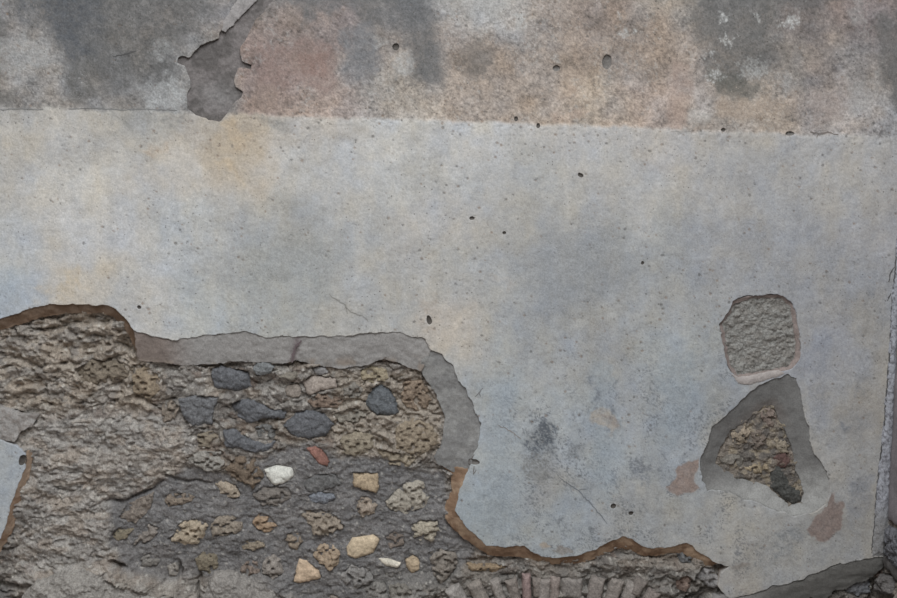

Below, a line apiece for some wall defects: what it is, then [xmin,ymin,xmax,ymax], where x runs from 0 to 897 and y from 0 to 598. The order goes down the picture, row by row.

water stain [0,0,228,140]
spalling [178,0,273,122]
water stain [282,0,532,99]
spalling [0,294,884,598]